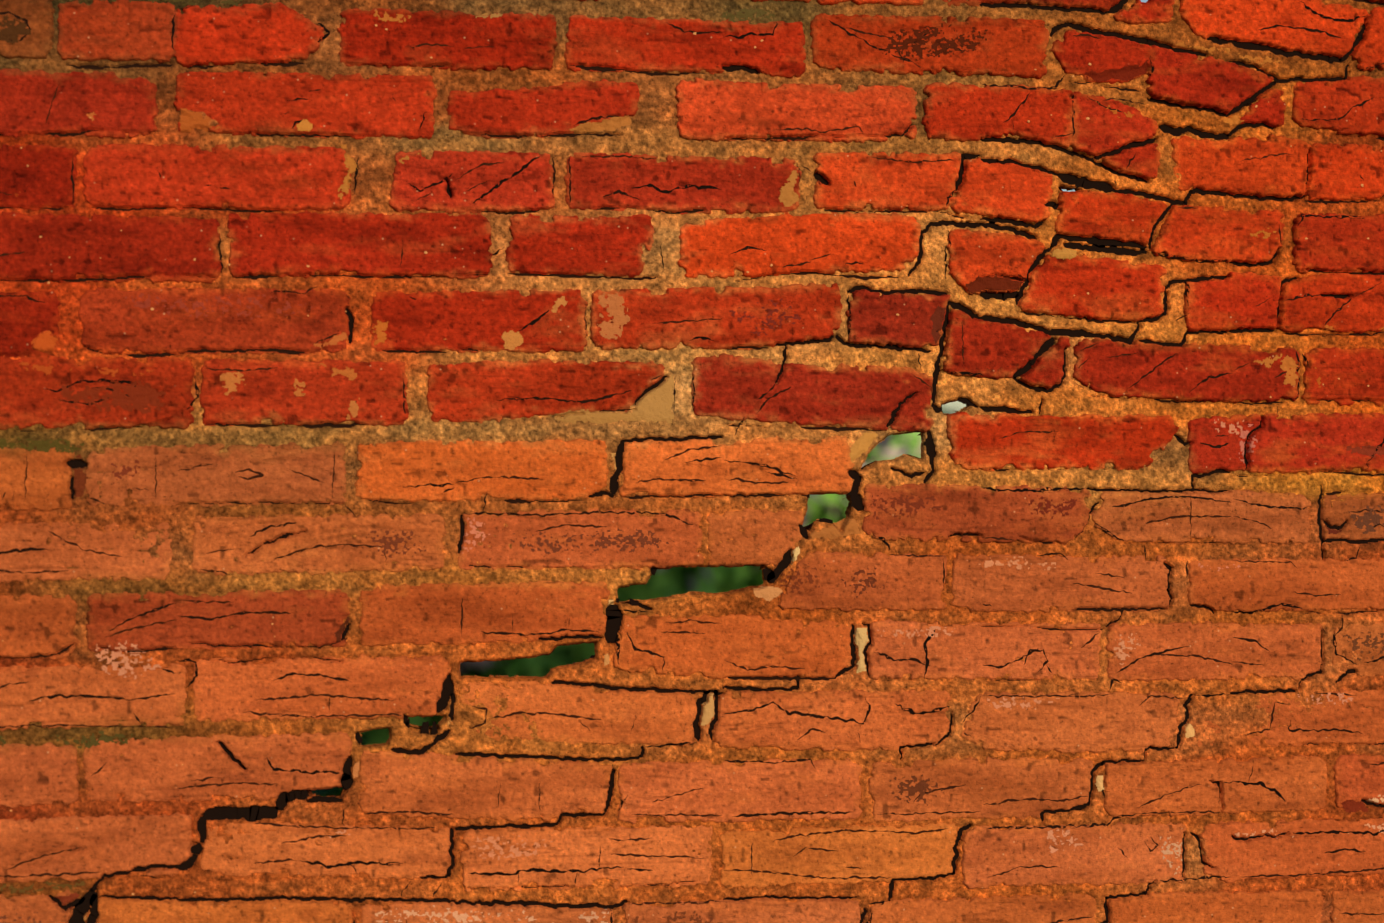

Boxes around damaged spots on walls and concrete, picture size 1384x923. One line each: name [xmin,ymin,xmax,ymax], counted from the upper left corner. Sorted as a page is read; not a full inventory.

crack [171,6,190,50]
crack [317,23,330,43]
crack [283,89,320,128]
crack [68,159,76,201]
crack [352,157,360,195]
crack [217,238,225,273]
crack [272,286,318,294]
crack [405,0,1384,590]
crack [314,308,354,344]